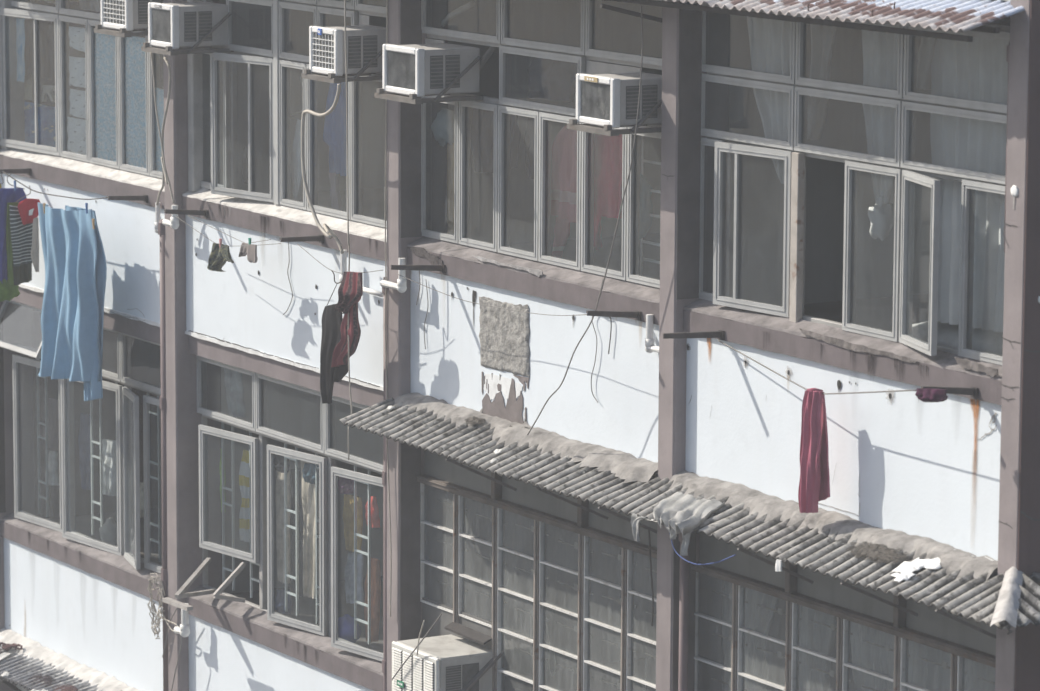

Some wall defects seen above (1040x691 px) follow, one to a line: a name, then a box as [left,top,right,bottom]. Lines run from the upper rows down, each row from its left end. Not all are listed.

peeling [480,372,529,424]
corrosion [970,399,979,459]